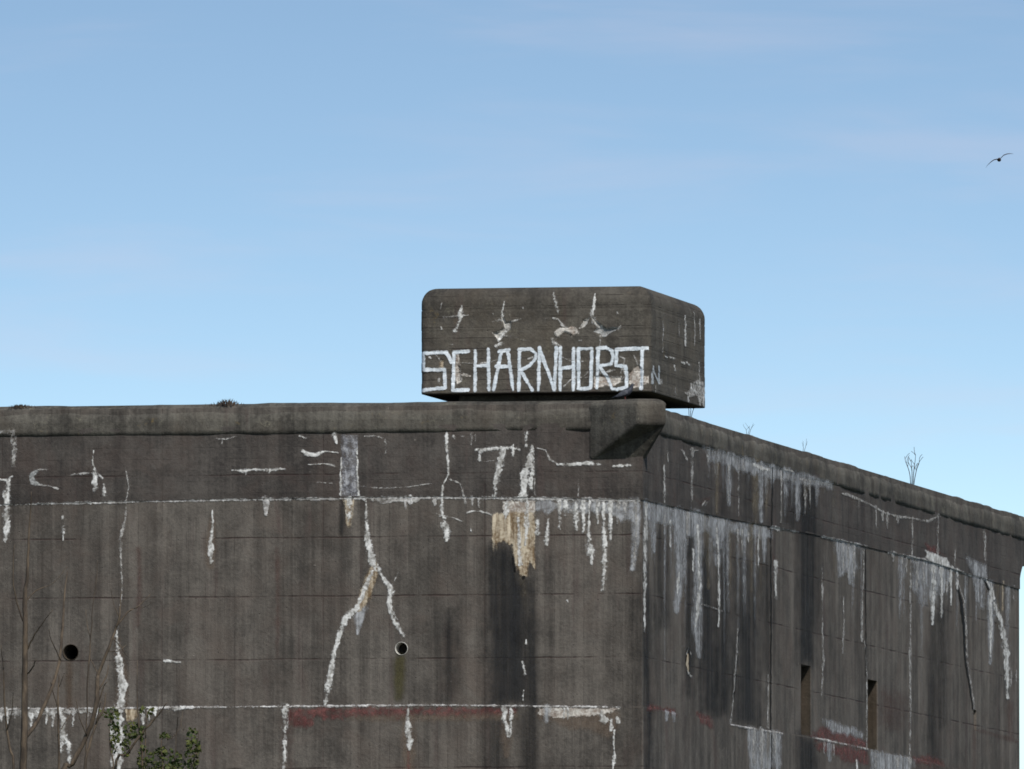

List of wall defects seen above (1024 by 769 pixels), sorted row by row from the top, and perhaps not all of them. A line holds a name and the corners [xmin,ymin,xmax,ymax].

water stain [0,431,16,542]
crack [324,501,404,705]
peeling [492,500,536,579]
water stain [489,549,620,769]
water stain [535,447,866,769]
water stain [866,514,1015,769]
crack [958,578,1010,709]